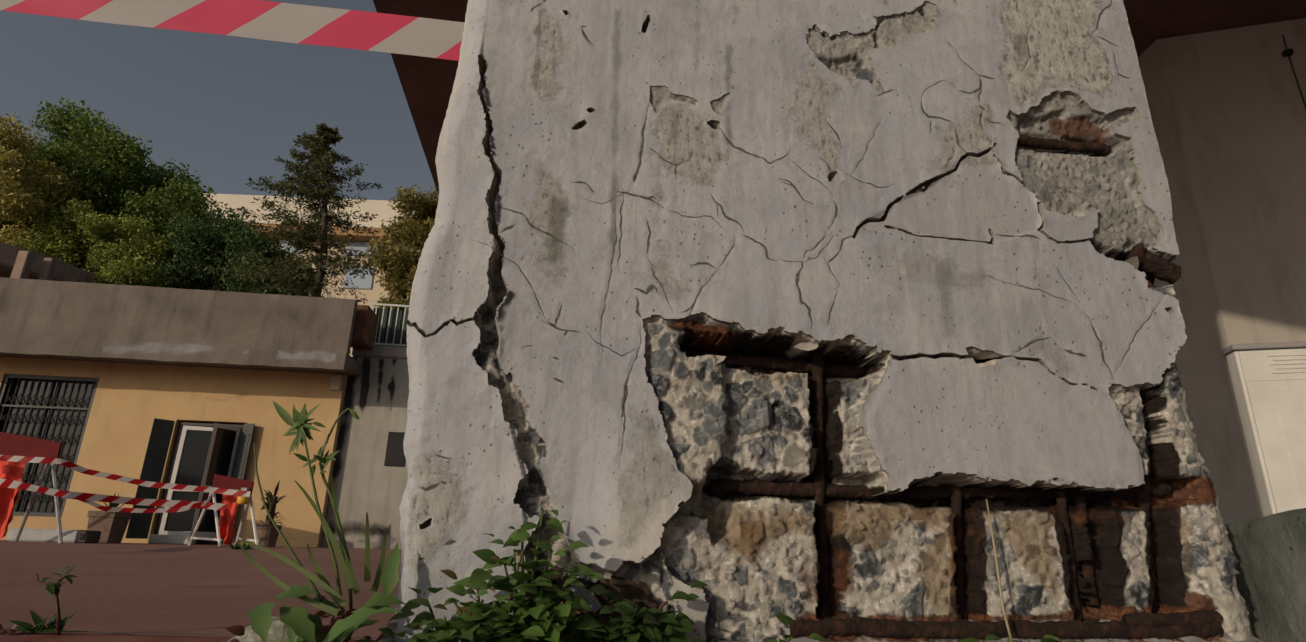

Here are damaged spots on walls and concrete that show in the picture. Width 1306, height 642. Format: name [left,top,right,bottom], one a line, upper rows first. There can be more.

crack [409,20,1158,518]
spalling [806,2,939,92]
spalling [939,0,1176,270]
rust [1050,116,1107,157]
crack [1091,0,1129,78]
rust [1104,250,1173,288]
spalling [1149,280,1176,314]
spalling [524,313,1132,642]
rust [667,321,1217,623]
spalling [1108,362,1252,642]